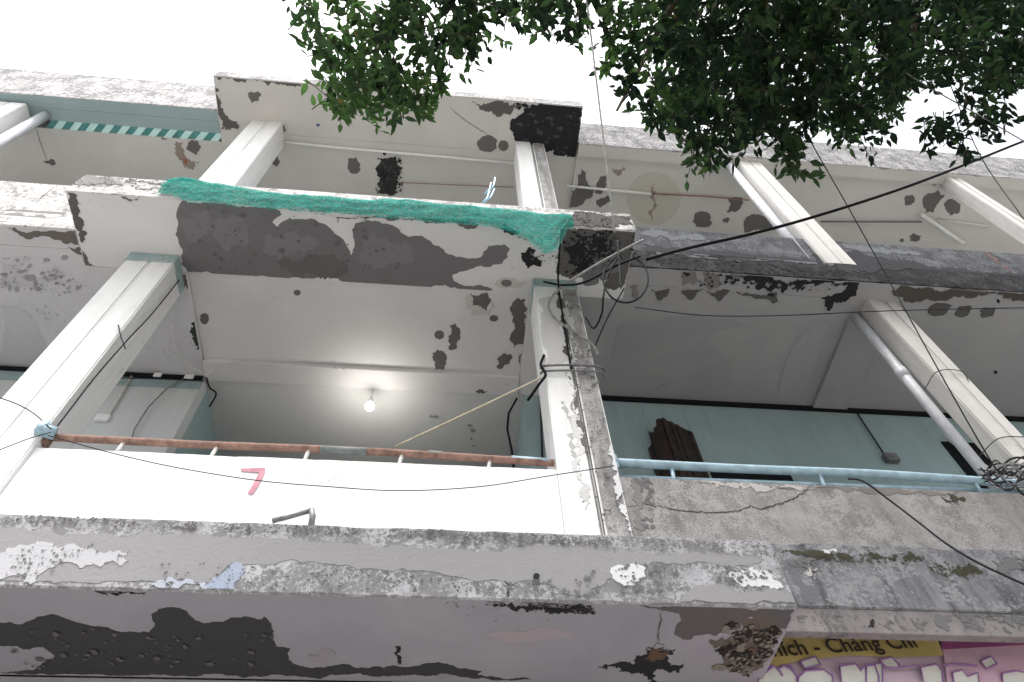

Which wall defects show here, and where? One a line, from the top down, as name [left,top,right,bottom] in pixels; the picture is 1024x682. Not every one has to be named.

spalling [294,210,479,281]
spalling [630,271,778,304]
peeling [608,444,632,532]
crack [628,482,825,514]
peeling [0,541,130,584]
peeling [610,562,691,595]
peeling [705,564,784,590]
peeling [0,632,124,673]
spalling [600,643,684,682]
spalling [709,616,783,677]